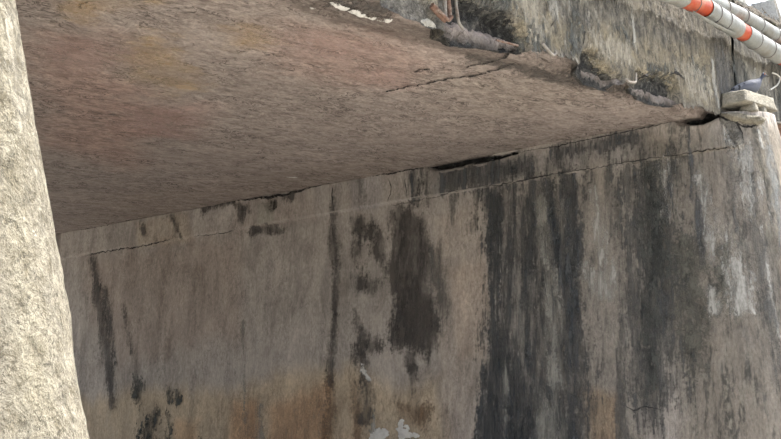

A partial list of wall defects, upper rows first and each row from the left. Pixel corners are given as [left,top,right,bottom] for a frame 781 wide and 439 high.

spalling [380,0,522,55]
crack [377,53,514,94]
spalling [570,34,631,92]
spalling [625,71,676,108]
spalling [687,113,744,148]
crack [375,117,756,206]
crack [238,183,333,204]
crack [91,240,166,255]
damp [350,168,450,439]
damp [439,123,781,439]
damp [88,257,118,409]
damp [130,373,183,439]